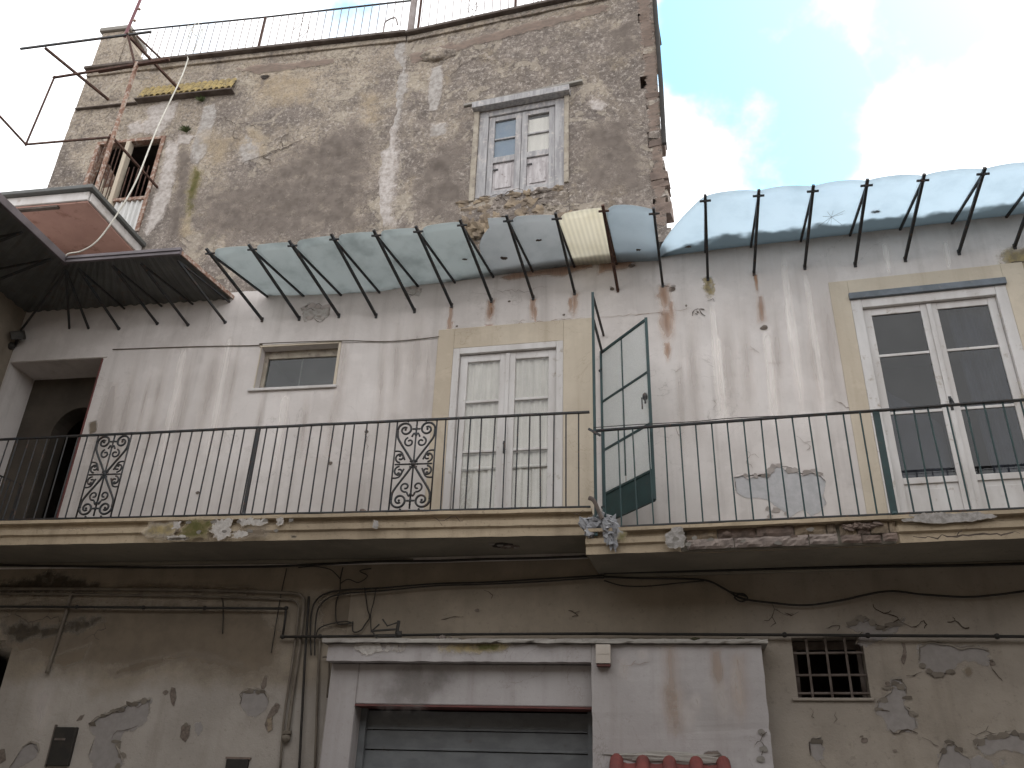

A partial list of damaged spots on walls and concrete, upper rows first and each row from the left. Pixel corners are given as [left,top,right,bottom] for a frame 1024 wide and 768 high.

damp [169,143,201,239]
rust [658,285,675,358]
rust [754,275,764,320]
spalling [167,516,293,541]
peeling [665,463,997,550]
crack [873,605,969,629]
peeling [77,688,176,768]
peeling [239,676,280,732]
peeling [846,615,995,752]
peeling [937,730,1024,768]